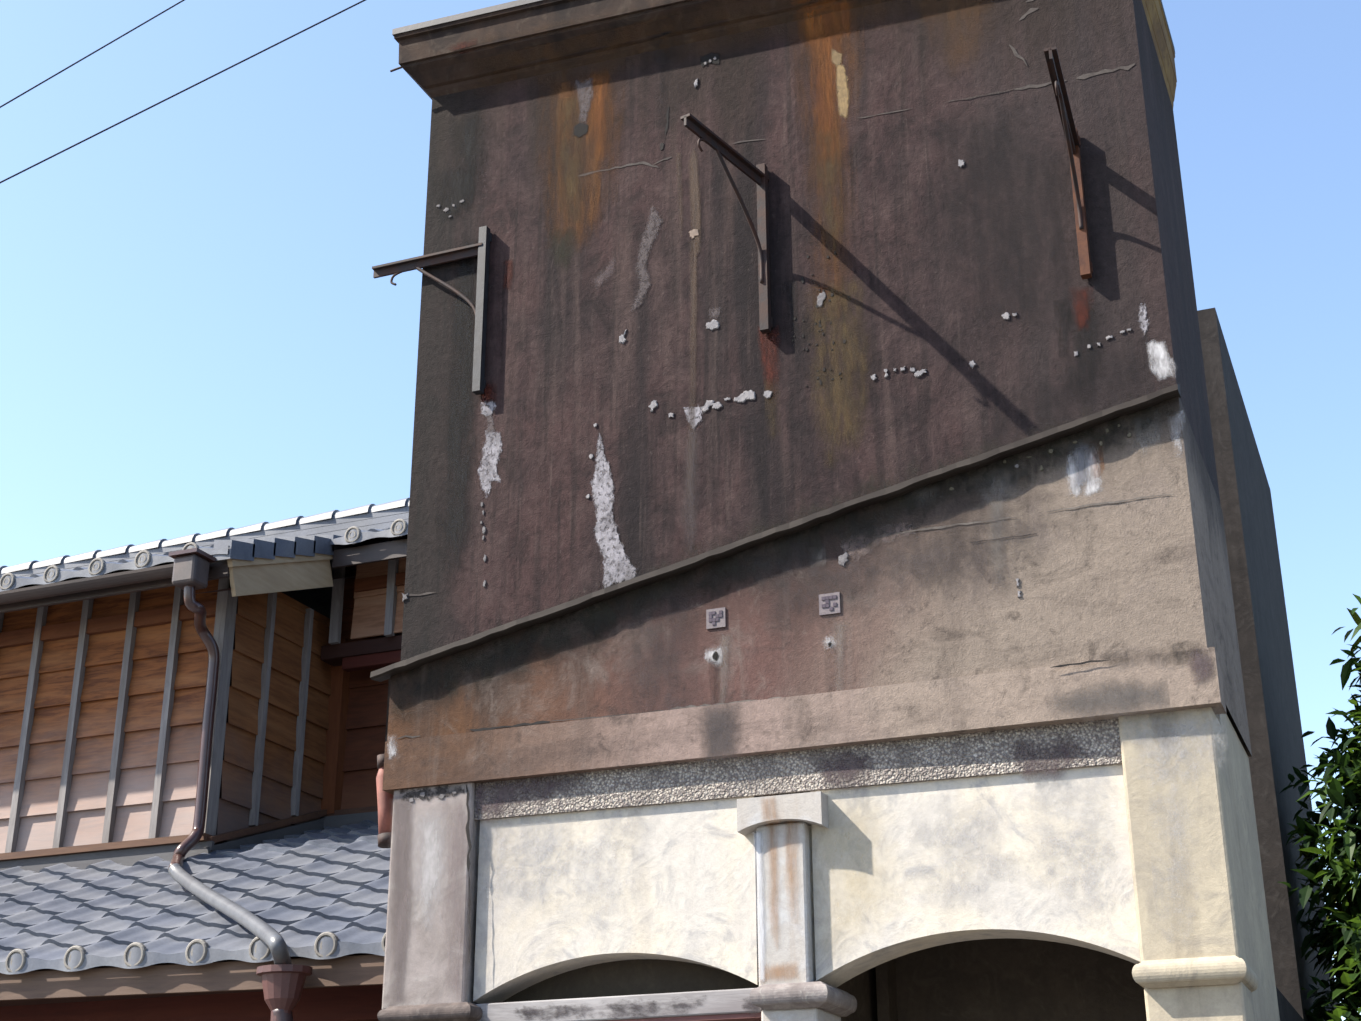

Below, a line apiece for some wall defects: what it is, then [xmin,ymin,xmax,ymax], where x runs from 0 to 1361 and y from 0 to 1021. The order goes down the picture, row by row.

peeling [832,50,849,118]
peeling [1074,303,1174,378]
peeling [648,390,773,430]
peeling [478,401,502,562]
peeling [586,423,636,588]
water stain [1059,686,1161,710]
water stain [706,710,733,757]
water stain [1016,740,1079,775]
crack [465,785,473,963]